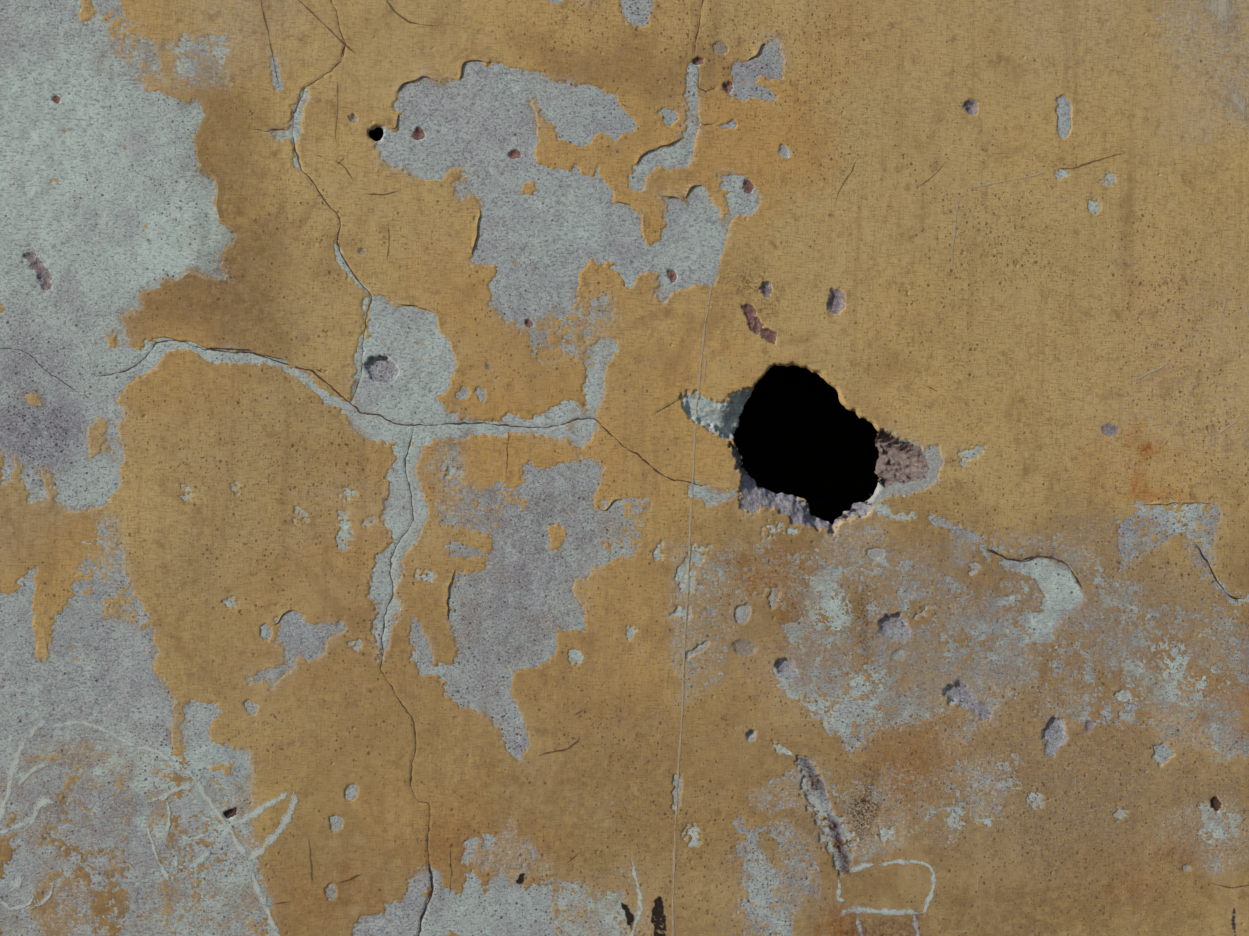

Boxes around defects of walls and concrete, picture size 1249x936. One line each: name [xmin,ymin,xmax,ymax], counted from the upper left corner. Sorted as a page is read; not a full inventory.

crack [694,0,714,92]
crack [0,0,703,936]
peeling [0,0,784,936]
peeling [668,388,1249,936]
crack [984,548,1082,588]
crack [1196,545,1240,602]